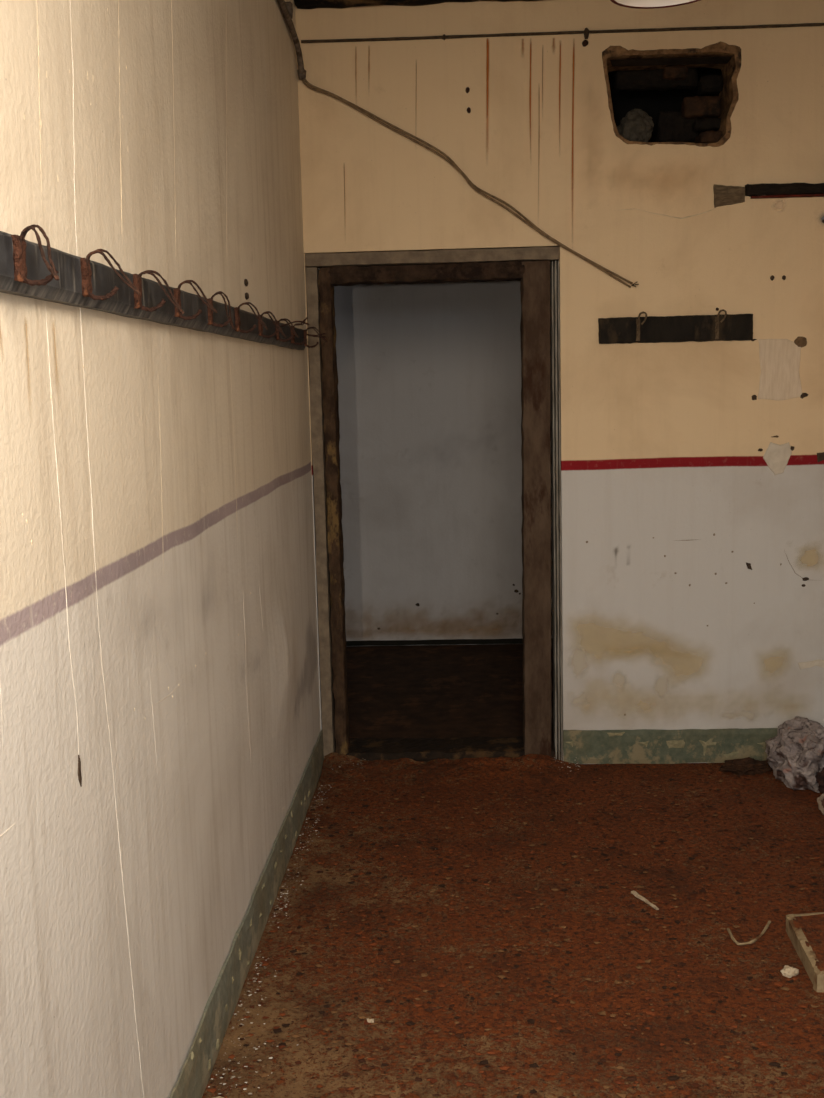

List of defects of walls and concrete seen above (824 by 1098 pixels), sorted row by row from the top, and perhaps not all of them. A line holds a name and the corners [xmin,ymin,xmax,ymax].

rust [522,40,543,133]
rust [553,39,574,191]
spalling [602,41,741,147]